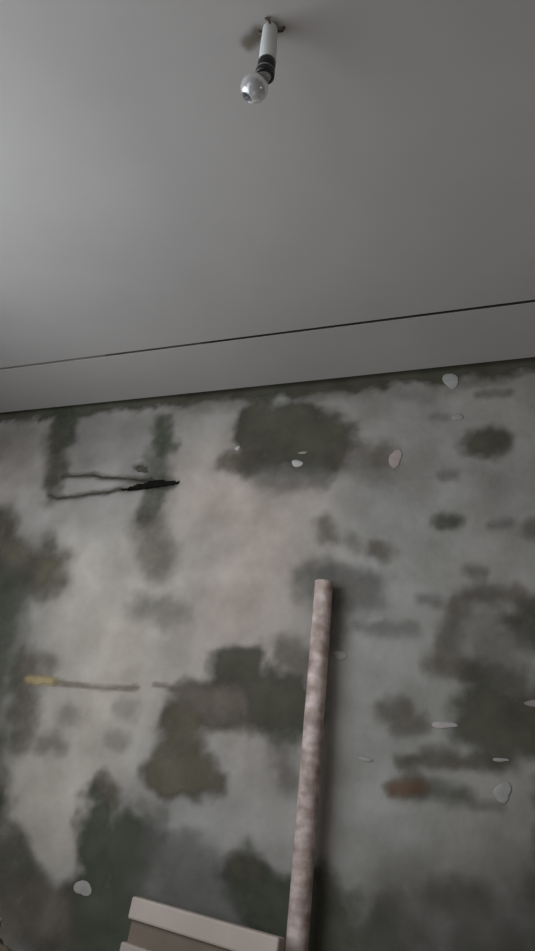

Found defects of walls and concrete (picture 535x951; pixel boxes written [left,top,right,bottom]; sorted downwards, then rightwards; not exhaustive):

peeling [442,374,458,389]
water stain [0,357,535,485]
peeling [389,449,402,468]
crack [49,465,179,499]
water stain [0,510,66,753]
water stain [276,644,309,676]
water stain [432,590,535,765]
corrosion [397,751,496,768]
corrosion [386,782,423,797]
water stain [0,825,73,950]
peeling [74,880,92,896]